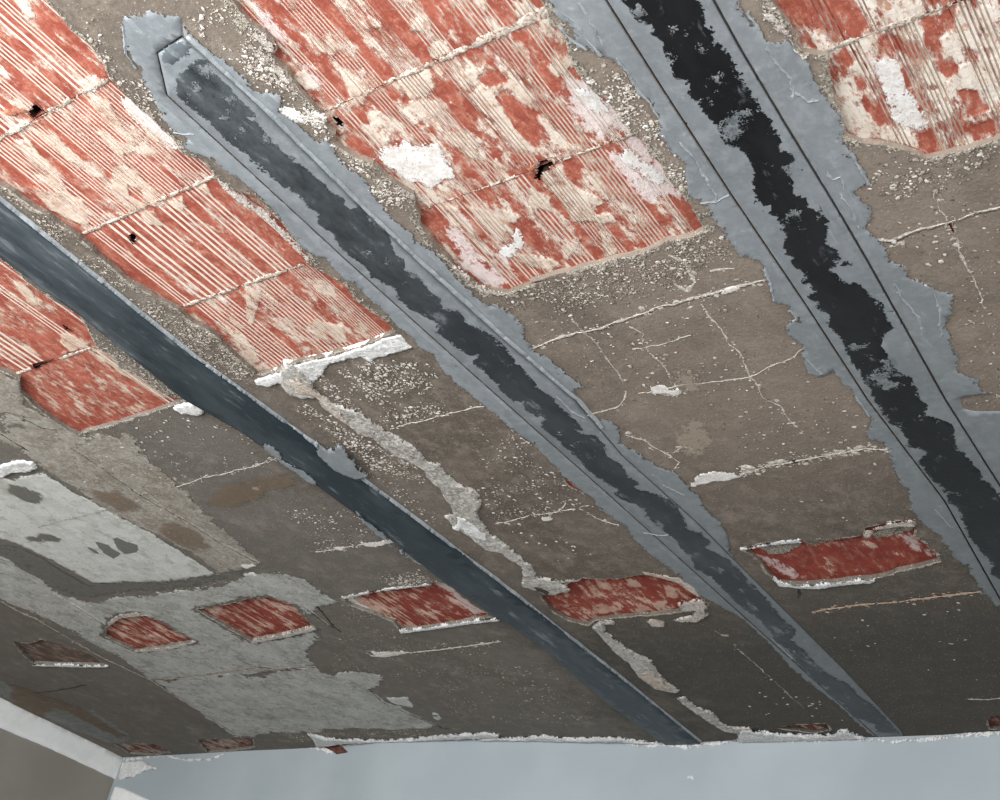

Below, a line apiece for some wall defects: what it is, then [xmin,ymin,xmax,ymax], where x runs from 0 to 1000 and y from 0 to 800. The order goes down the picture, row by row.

crack [877,197,1000,309]
spalling [162,0,1000,755]
crack [529,255,891,487]
flaking render [13,639,109,668]
flaking render [103,612,197,653]